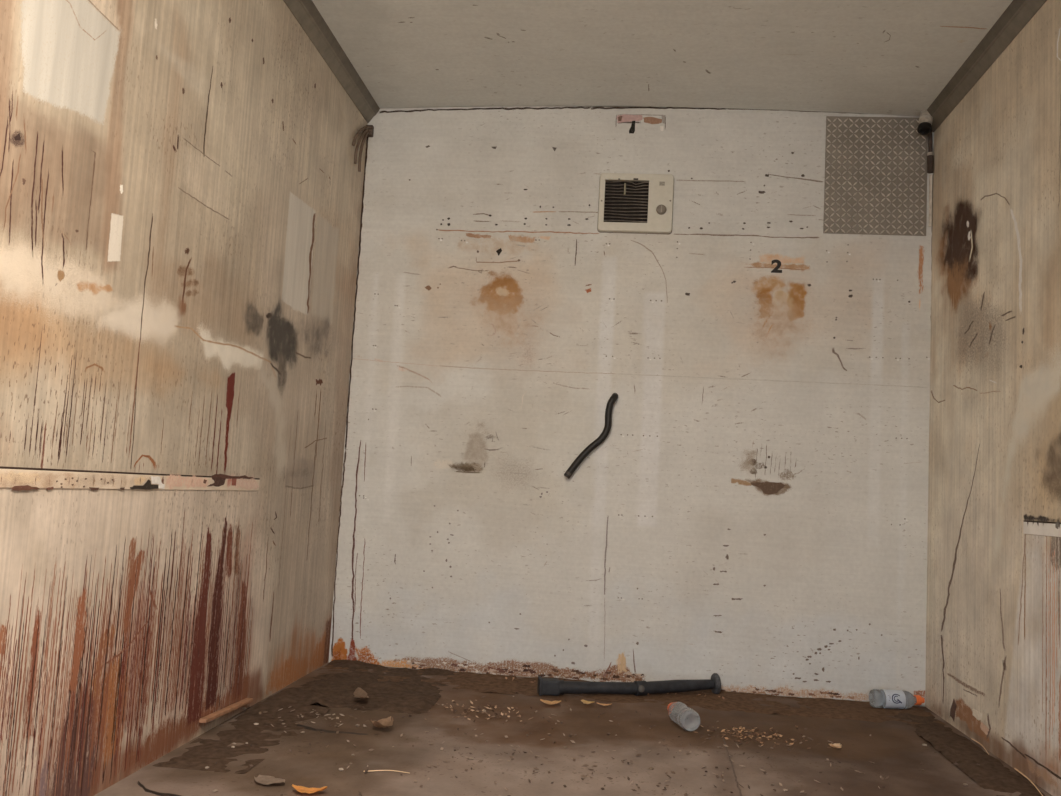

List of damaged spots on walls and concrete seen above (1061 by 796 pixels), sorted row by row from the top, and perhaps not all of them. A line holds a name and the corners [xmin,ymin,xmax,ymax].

corrosion [0,91,71,286]
corrosion [75,280,112,295]
water stain [176,248,199,319]
corrosion [451,232,566,352]
corrosion [736,254,831,376]
corrosion [0,327,164,490]
corrosion [188,372,240,474]
corrosion [0,511,253,796]
corrosion [263,615,429,698]
corrosion [1042,536,1061,763]